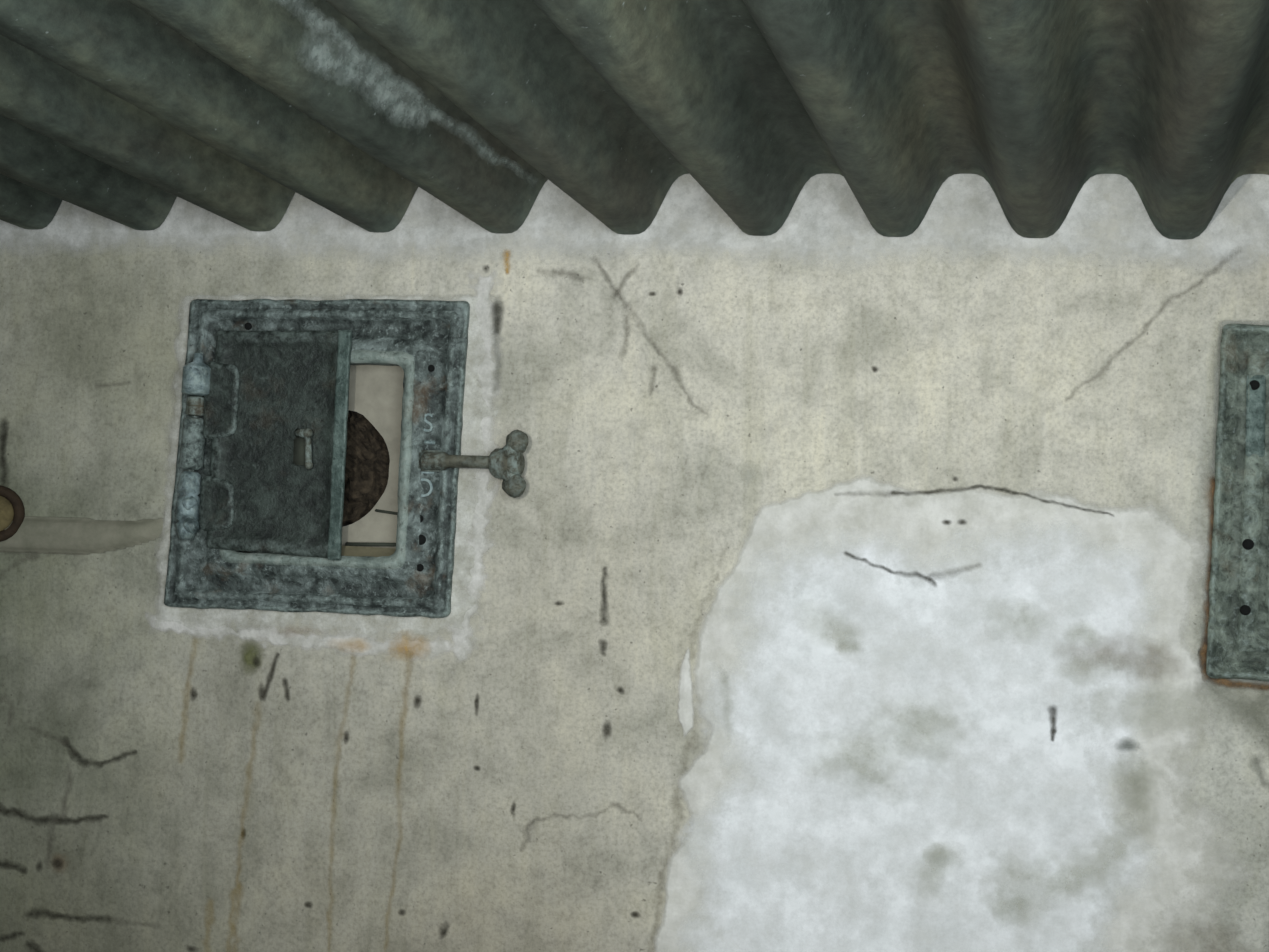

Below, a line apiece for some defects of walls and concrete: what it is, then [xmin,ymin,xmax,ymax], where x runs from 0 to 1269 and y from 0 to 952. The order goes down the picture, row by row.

crack [892,478,1104,513]
crack [846,553,935,583]
peeling [656,478,1216,952]
crack [65,741,136,766]
crack [0,807,106,823]
crack [0,862,40,873]
crack [1,911,110,952]